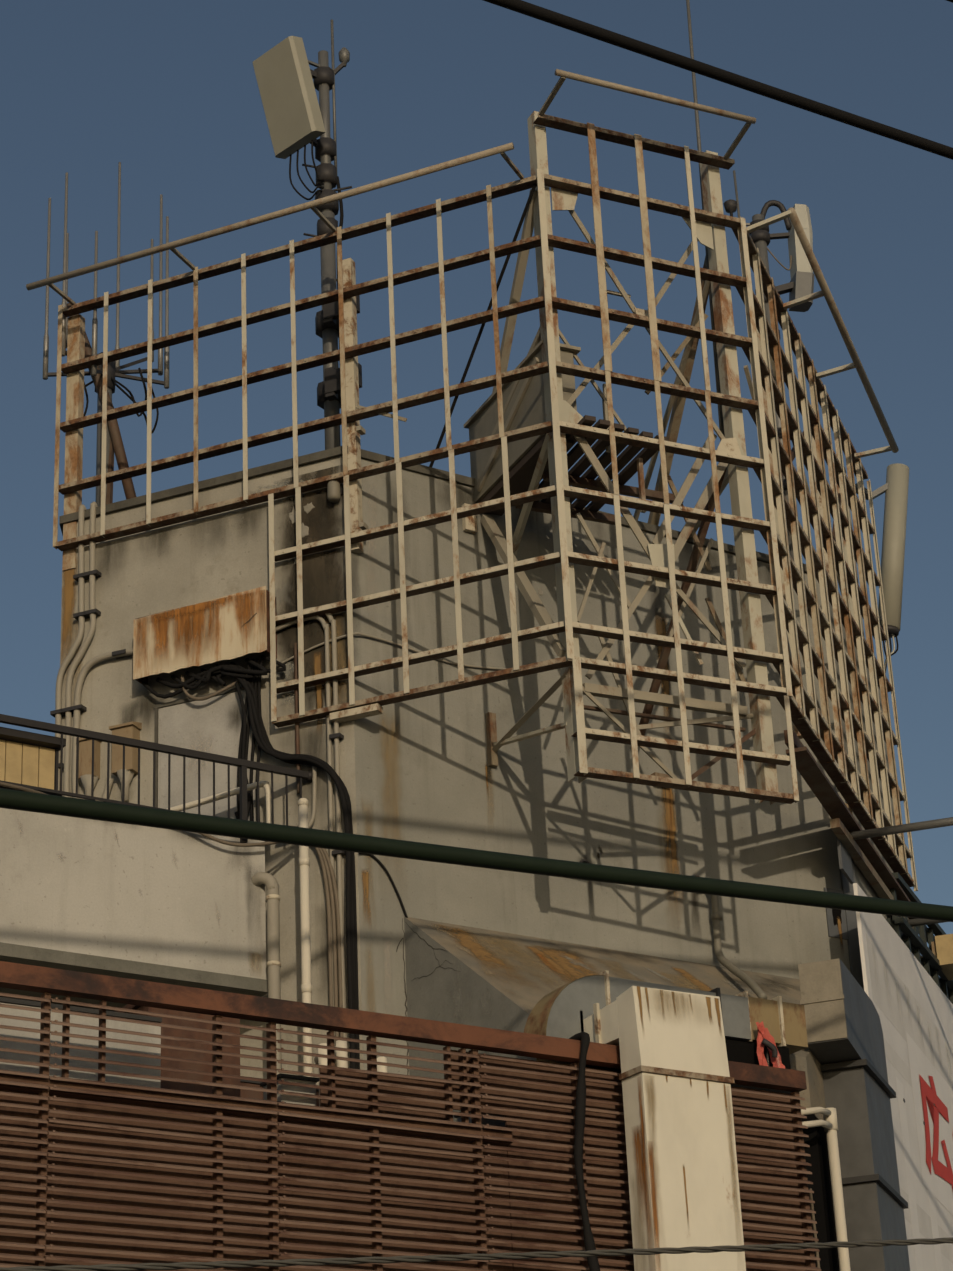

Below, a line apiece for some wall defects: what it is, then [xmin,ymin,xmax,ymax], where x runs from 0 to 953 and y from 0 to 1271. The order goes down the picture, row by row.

corrosion [662,787,679,874]
crack [396,919,460,1075]
corrosion [440,925,622,981]
corrosion [637,968,721,1029]
corrosion [634,1075,668,1247]
corrosion [724,1084,735,1176]